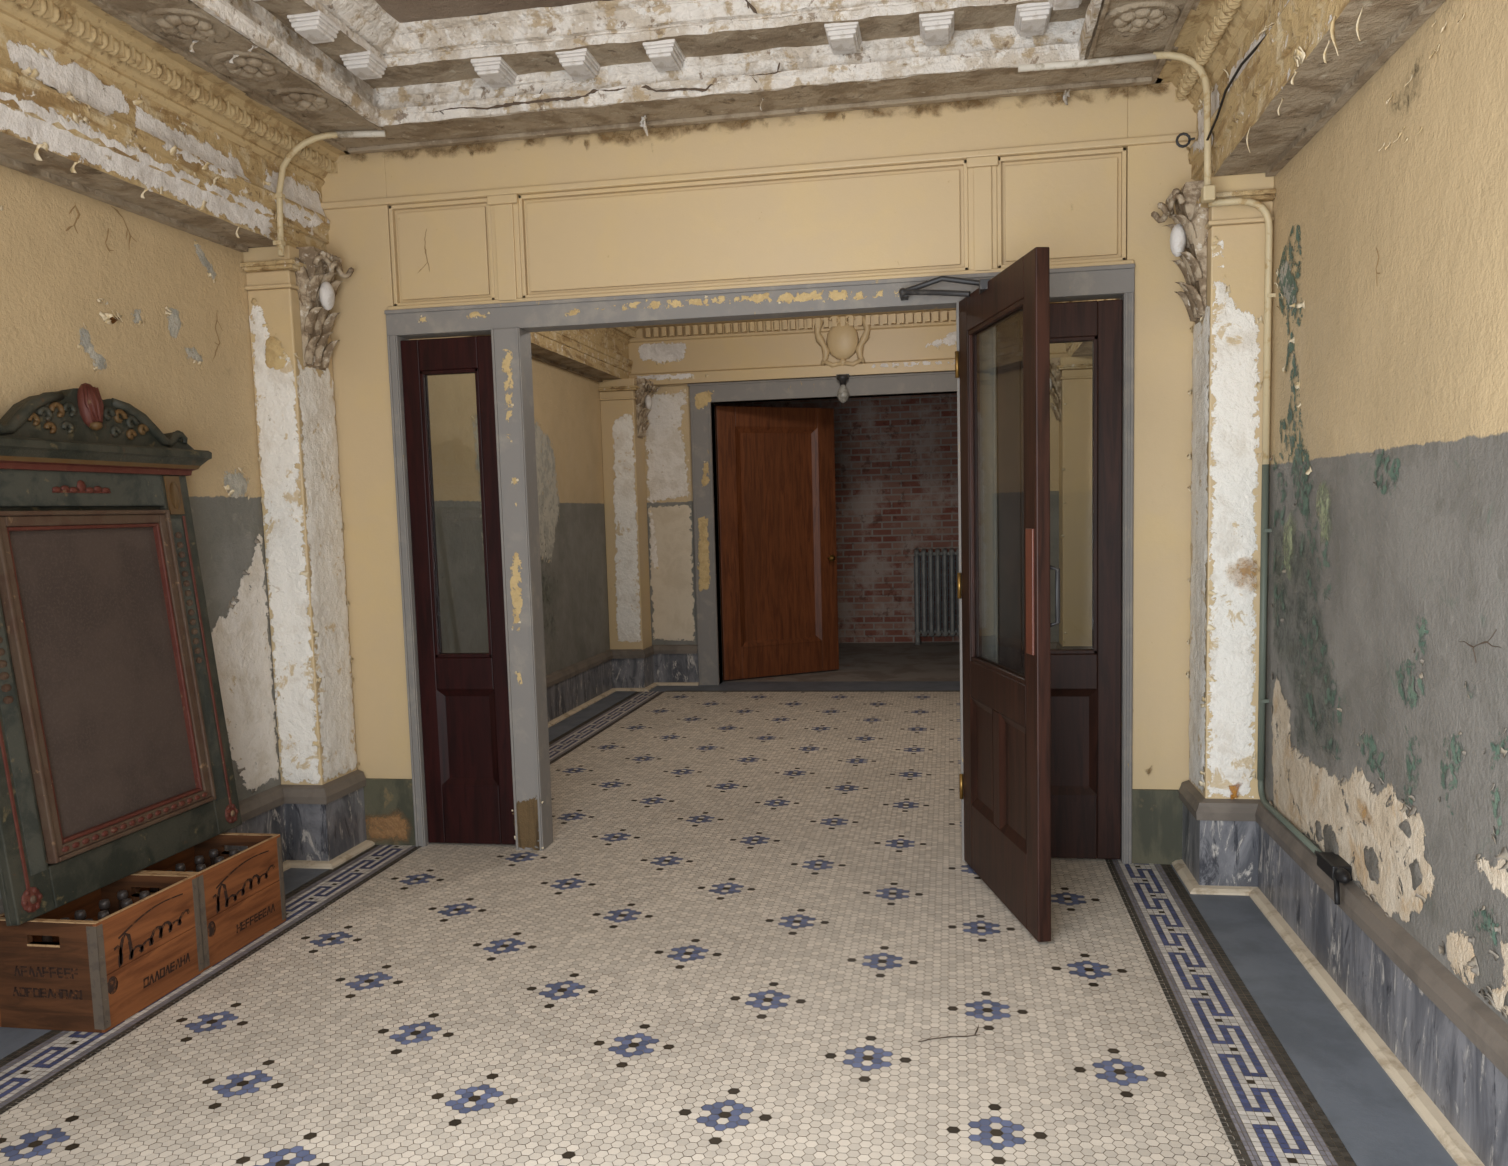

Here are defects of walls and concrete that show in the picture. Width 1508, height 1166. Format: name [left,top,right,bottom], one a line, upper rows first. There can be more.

peeling [0,40,330,239]
peeling [1186,0,1290,154]
peeling [1277,14,1339,116]
peeling [565,290,899,316]
peeling [211,298,359,793]
leakage [1275,517,1330,740]
peeling [1186,223,1435,923]
crack [1459,629,1501,663]
peeling [1438,728,1508,1019]